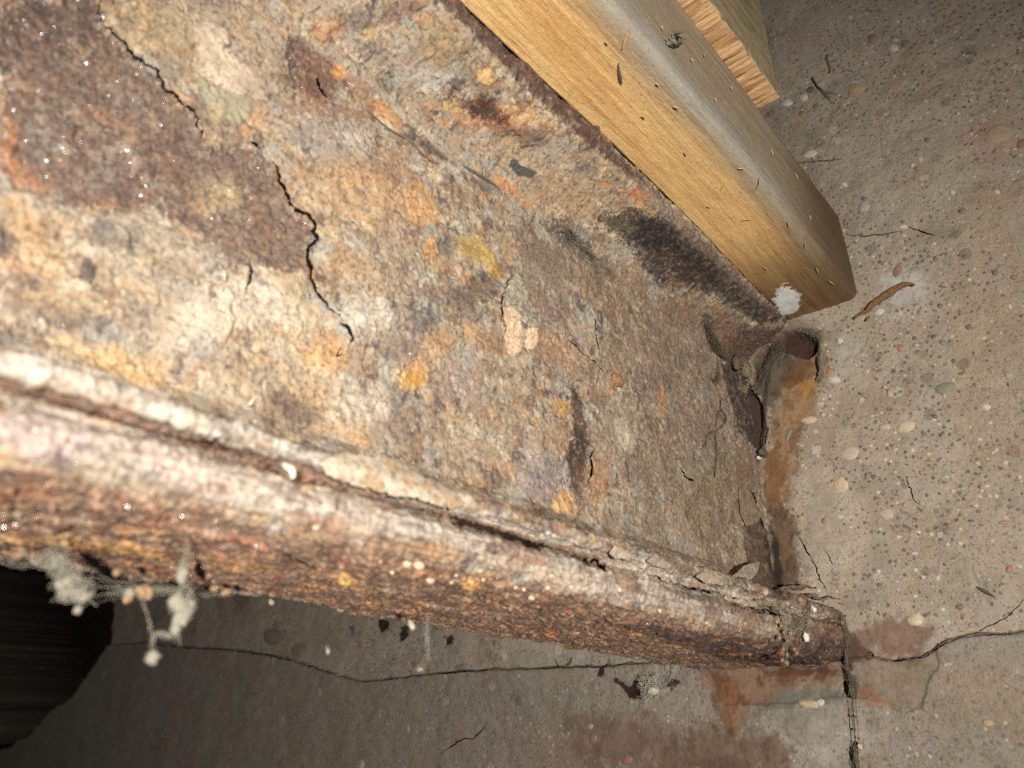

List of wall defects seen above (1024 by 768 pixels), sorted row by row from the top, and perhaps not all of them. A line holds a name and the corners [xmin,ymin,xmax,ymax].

crack [98,0,203,138]
crack [316,75,328,98]
crack [245,263,253,290]
crack [250,141,354,357]
rust [456,237,529,308]
rust [3,388,631,572]
rust [646,360,828,594]
crack [122,643,640,683]
rust [700,620,930,741]
crack [859,599,1024,662]